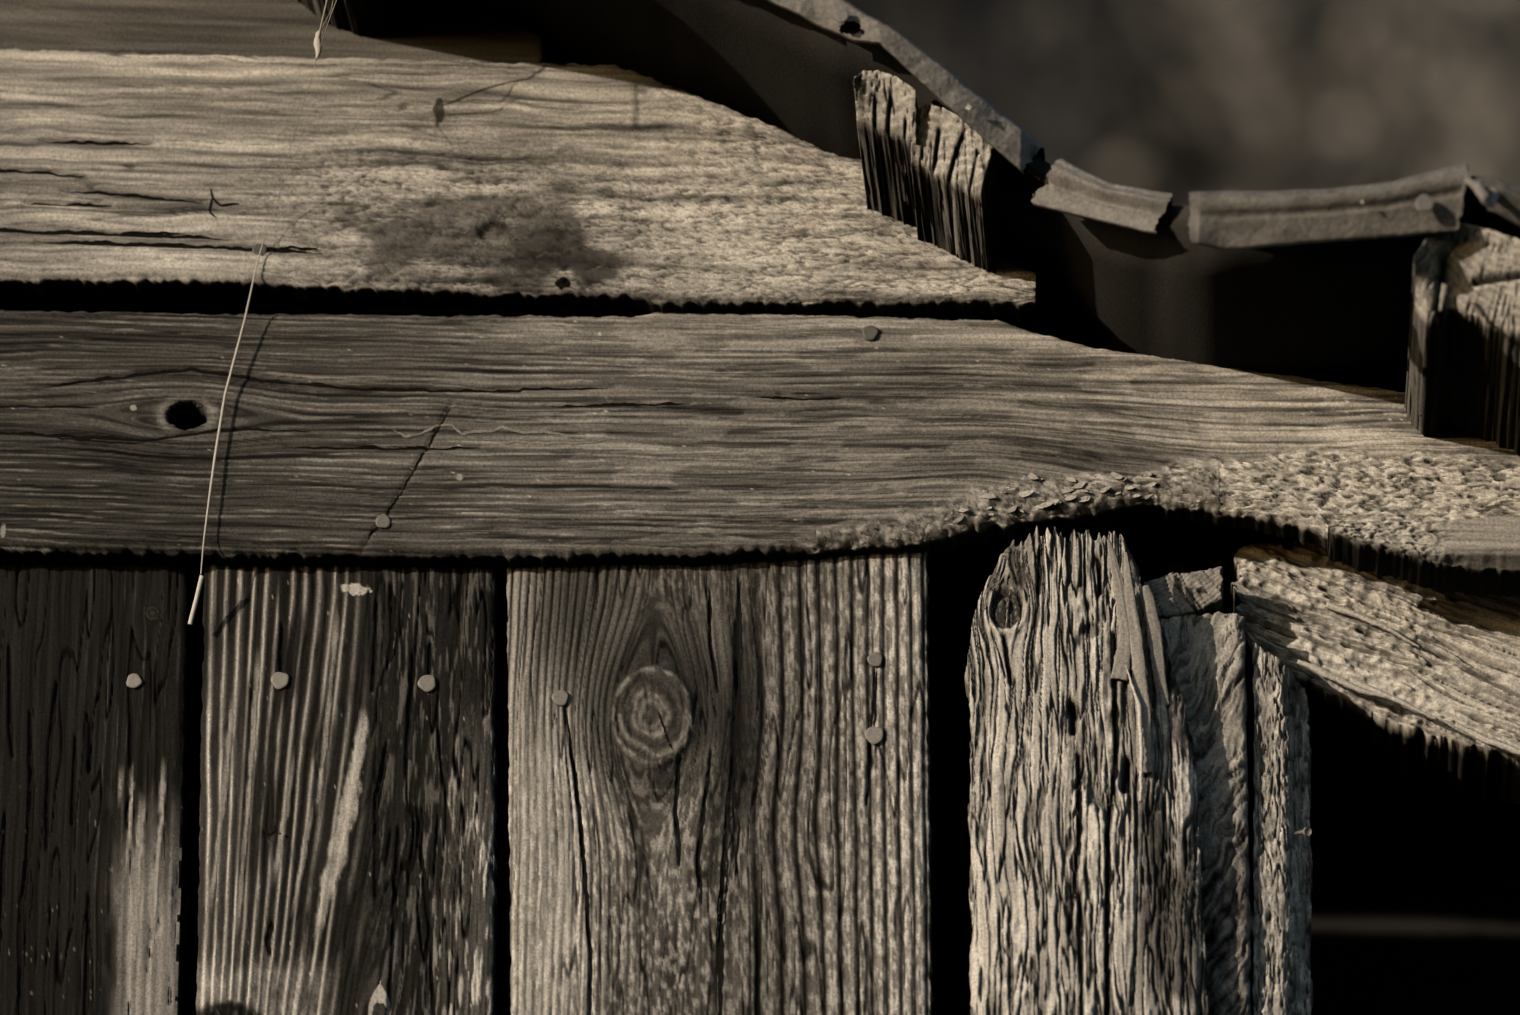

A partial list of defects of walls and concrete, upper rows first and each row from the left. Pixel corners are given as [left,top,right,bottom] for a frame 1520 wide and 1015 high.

crack [0,367,686,550]
crack [0,631,134,1015]
crack [266,921,274,955]
crack [277,626,285,670]
crack [370,585,435,1015]
crack [565,710,592,1015]